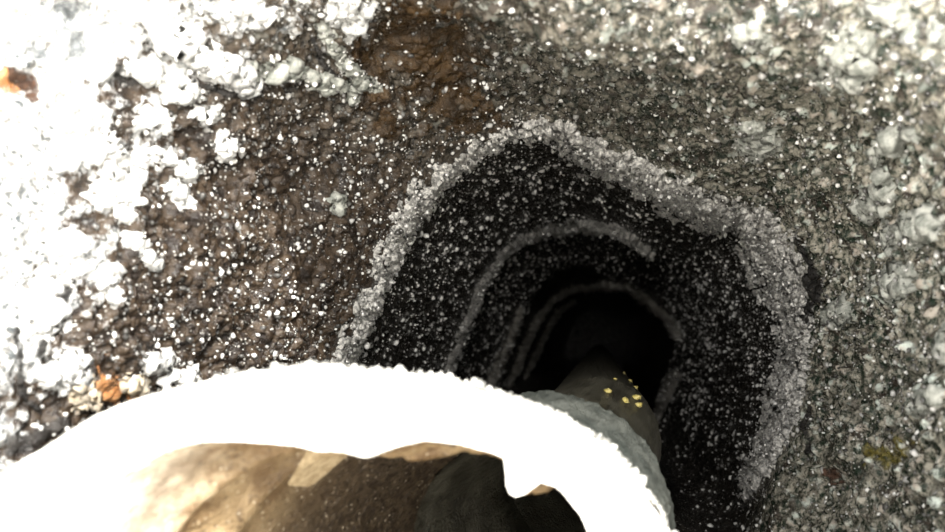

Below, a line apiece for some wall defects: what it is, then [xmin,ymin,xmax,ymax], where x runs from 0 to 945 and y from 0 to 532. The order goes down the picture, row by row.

spalling [724,17,773,54]
spalling [805,0,932,97]
spalling [925,8,945,55]
rust [0,67,20,92]
spalling [70,0,383,273]
spalling [730,120,786,164]
spalling [847,124,945,307]
spalling [93,261,127,309]
spalling [20,225,104,415]
peeling [117,347,202,397]
spalling [905,384,945,419]
peeling [288,451,349,487]